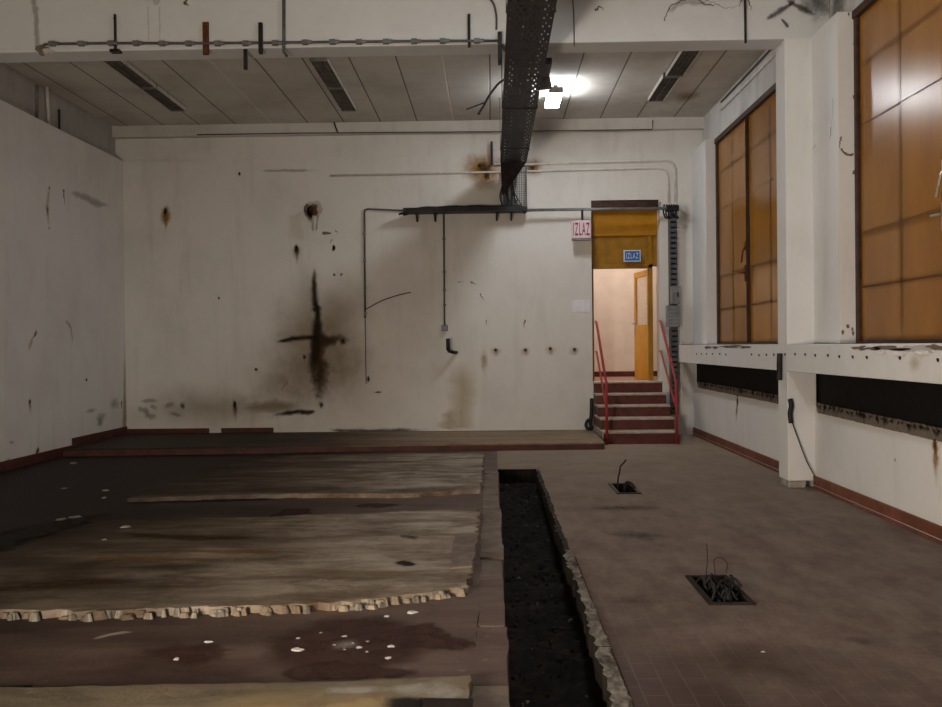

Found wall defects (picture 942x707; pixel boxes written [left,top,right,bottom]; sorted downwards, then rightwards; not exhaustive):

corrosion [469,158,496,183]
water stain [256,273,345,415]
spalling [841,324,942,356]